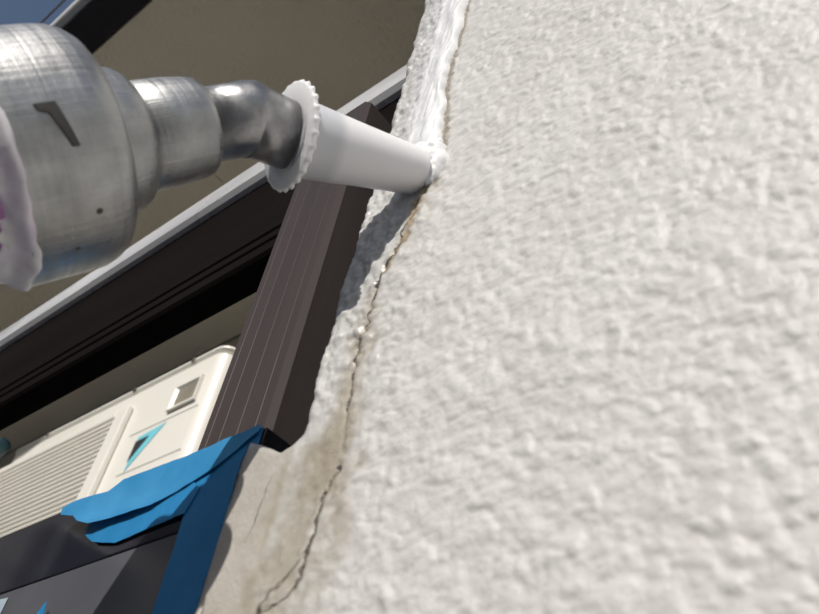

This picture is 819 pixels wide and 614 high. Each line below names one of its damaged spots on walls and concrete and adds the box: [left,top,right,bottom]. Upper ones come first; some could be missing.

crack [257,196,418,614]